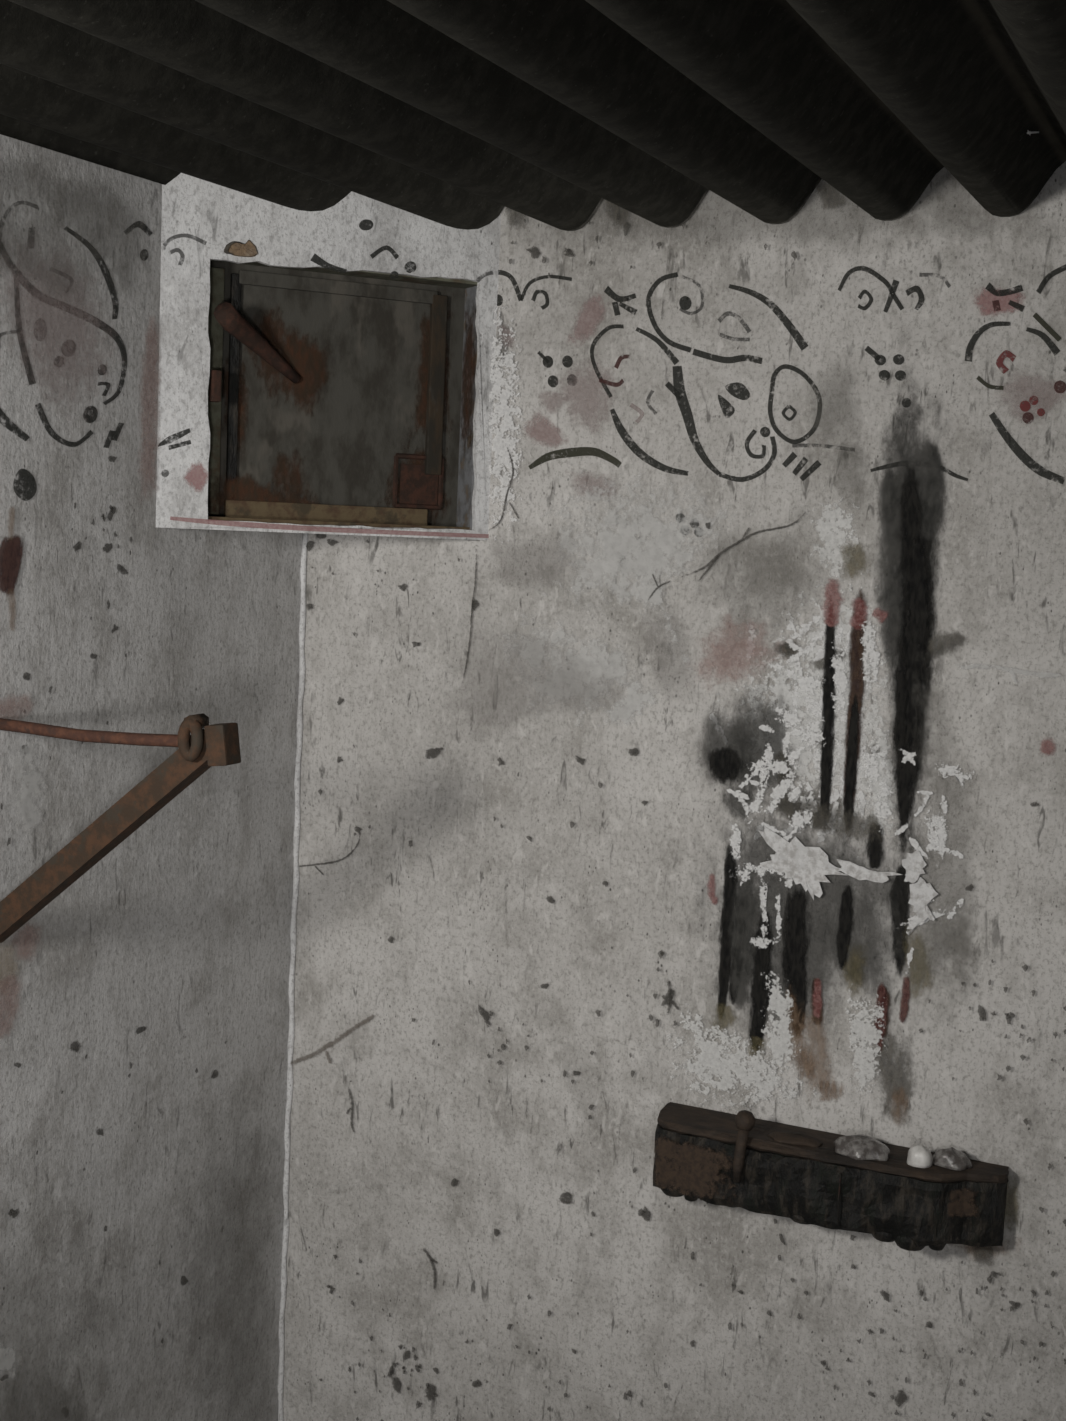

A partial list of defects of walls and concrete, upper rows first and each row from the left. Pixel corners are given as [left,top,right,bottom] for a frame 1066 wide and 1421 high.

corrosion [214,302,328,448]
corrosion [416,311,476,446]
corrosion [208,451,317,511]
spalling [71,505,132,574]
water stain [929,633,963,655]
peeling [709,498,974,974]
peeling [649,971,815,1112]
peeling [845,990,885,1093]
spalling [969,1005,1031,1080]
spalling [559,1192,572,1204]
spalling [629,1201,651,1222]
spalling [370,1337,439,1408]